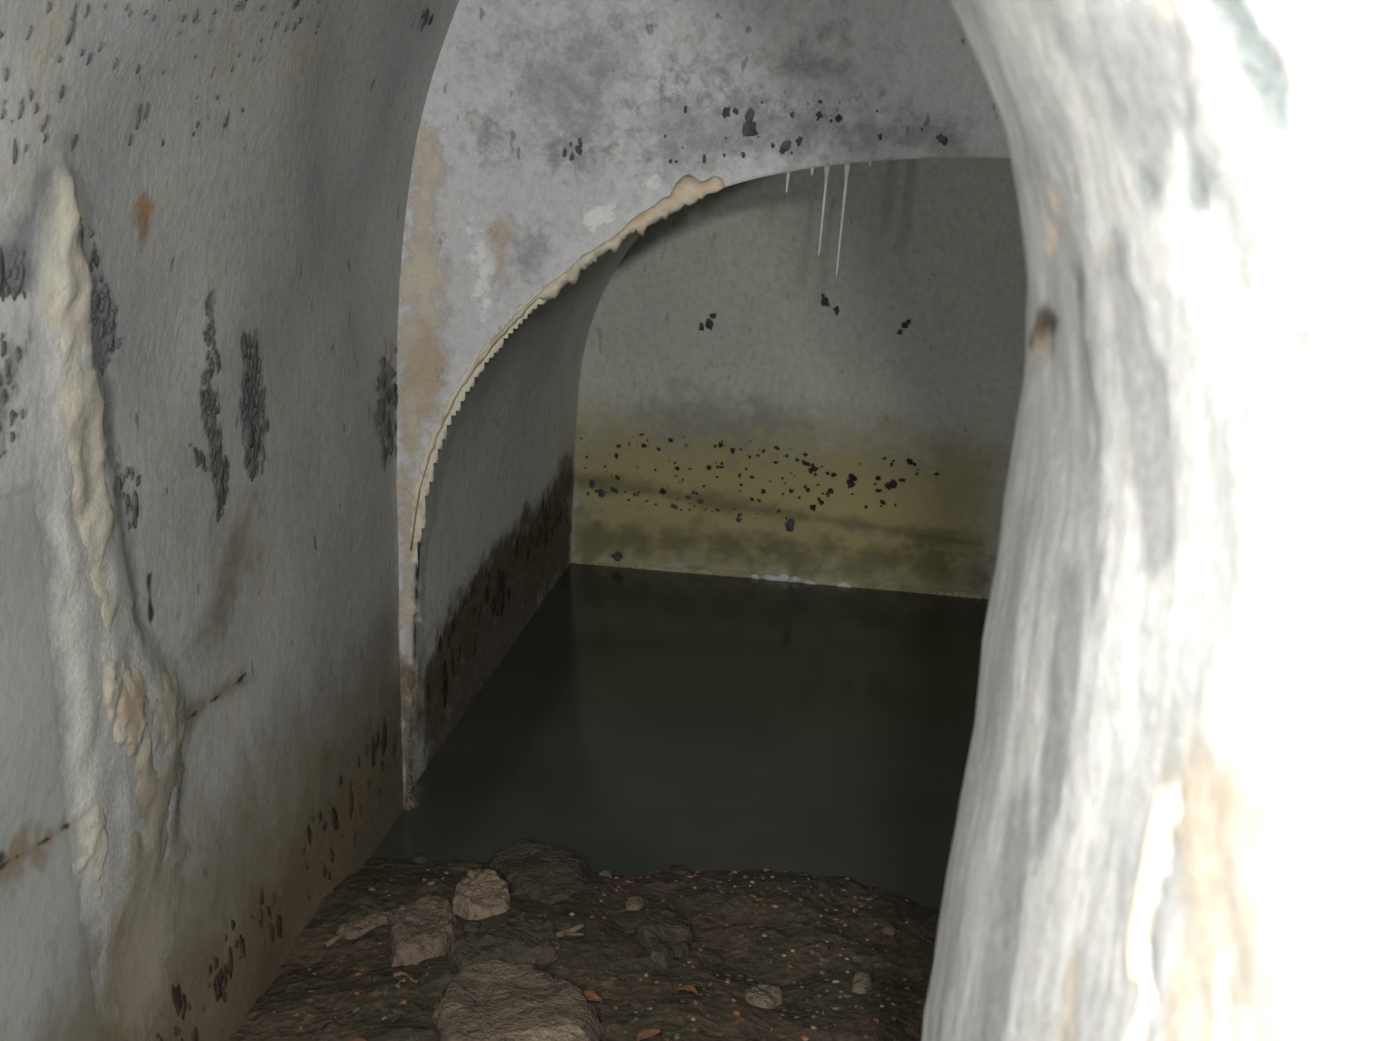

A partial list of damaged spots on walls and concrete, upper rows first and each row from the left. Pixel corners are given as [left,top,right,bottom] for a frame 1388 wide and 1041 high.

leakage [58,3,107,65]
leakage [420,8,434,31]
leakage [1,89,48,164]
leakage [722,101,803,158]
leakage [790,100,843,123]
leakage [80,224,120,376]
spalling [410,174,725,551]
leakage [104,393,141,584]
leakage [156,127,983,1041]